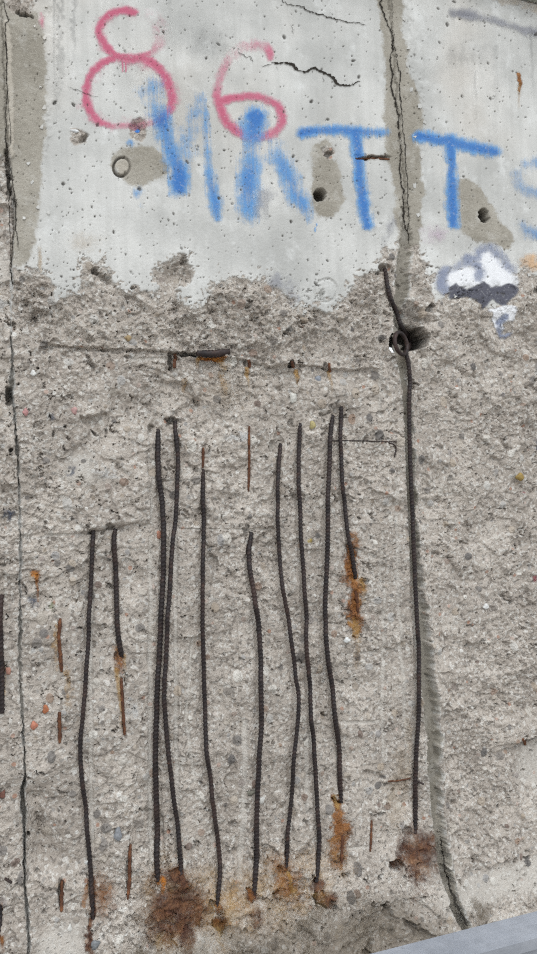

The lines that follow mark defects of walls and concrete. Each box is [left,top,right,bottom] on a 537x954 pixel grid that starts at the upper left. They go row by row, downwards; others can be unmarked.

crack [238,48,359,86]
crack [3,1,18,287]
spalling [321,145,336,160]
crack [282,0,410,243]
spalling [0,154,461,954]
corrosion [339,532,365,634]
spalling [383,245,537,927]
corrosion [149,867,262,953]
corrosion [310,879,337,906]
corrosion [328,795,352,869]
corrosion [391,830,438,880]
crack [439,836,467,926]